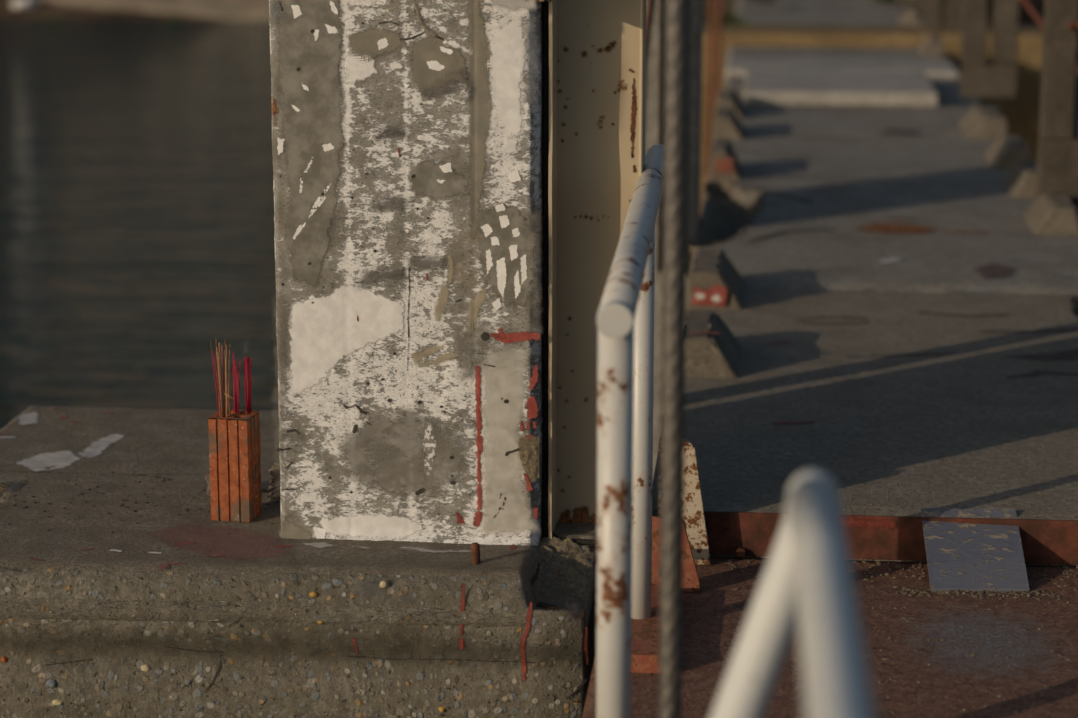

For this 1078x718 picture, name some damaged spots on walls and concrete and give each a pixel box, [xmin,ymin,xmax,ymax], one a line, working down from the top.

rust [617,69,637,172]
peeling [272,0,536,311]
peeling [529,364,538,389]
peeling [276,429,300,469]
spalling [505,421,539,492]
peeling [280,520,336,539]
rust [559,507,597,523]